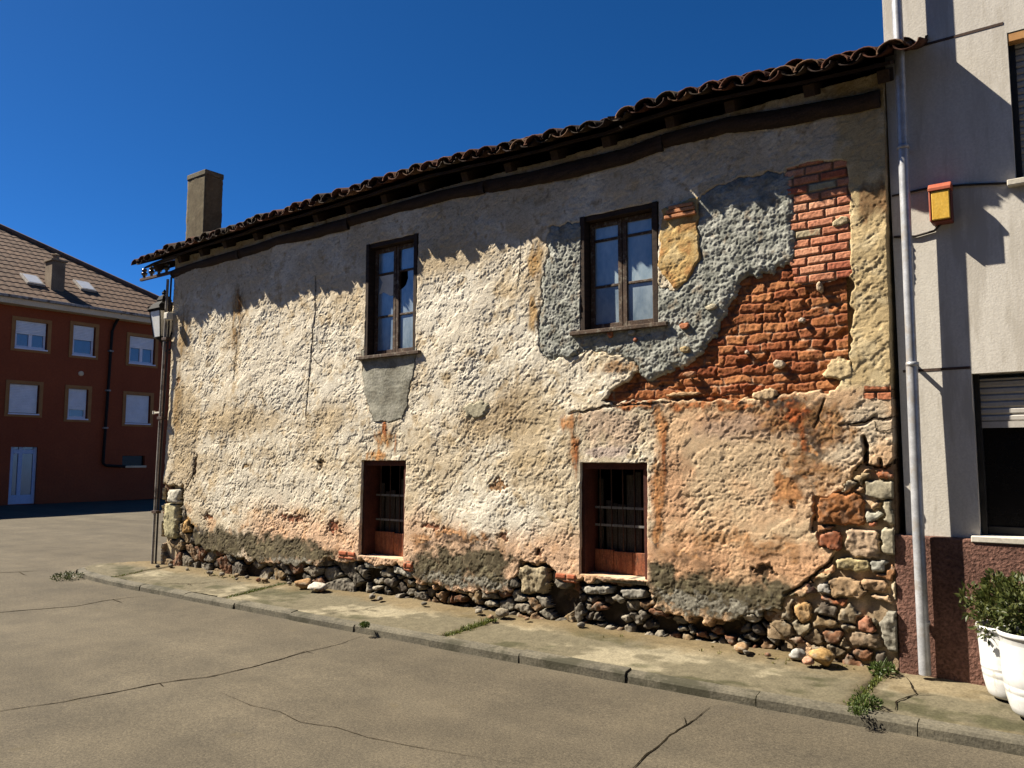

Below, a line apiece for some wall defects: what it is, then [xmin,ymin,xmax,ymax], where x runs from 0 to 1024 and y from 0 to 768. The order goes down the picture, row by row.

flaking render [605,160,853,405]
flaking render [863,386,891,400]
rust [561,414,579,472]
rust [617,395,855,563]
water stain [411,541,521,592]